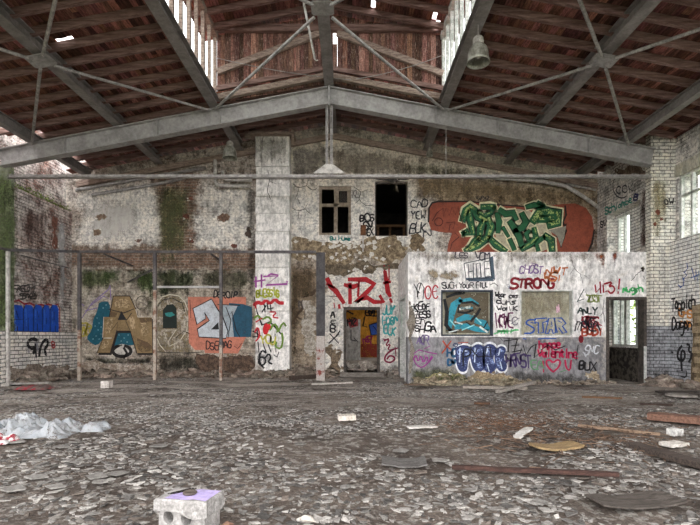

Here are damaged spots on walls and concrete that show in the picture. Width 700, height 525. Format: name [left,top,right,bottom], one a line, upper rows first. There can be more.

flaking render [291,233,426,277]
flaking render [300,296,316,356]